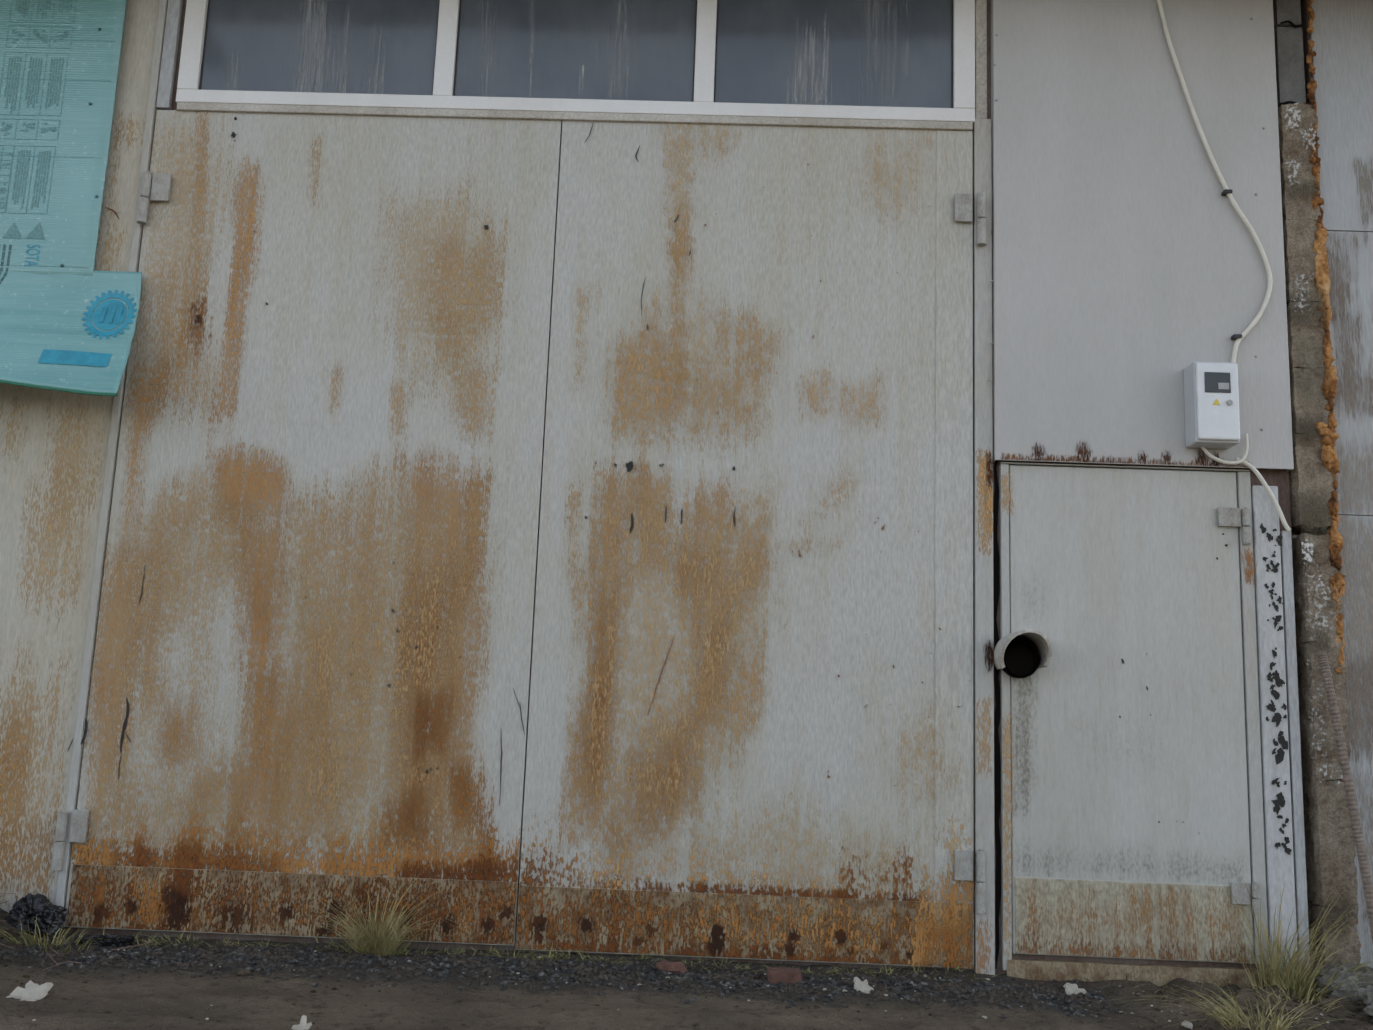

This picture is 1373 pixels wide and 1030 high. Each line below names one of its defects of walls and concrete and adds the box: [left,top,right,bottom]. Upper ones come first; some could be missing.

peeling [1327,162,1373,418]
corrosion [20,405,101,612]
corrosion [68,115,1252,974]
corrosion [1242,548,1255,584]
peeling [1260,523,1283,631]
corrosion [0,650,68,901]
peeling [1266,648,1292,855]
spalling [1301,539,1373,944]